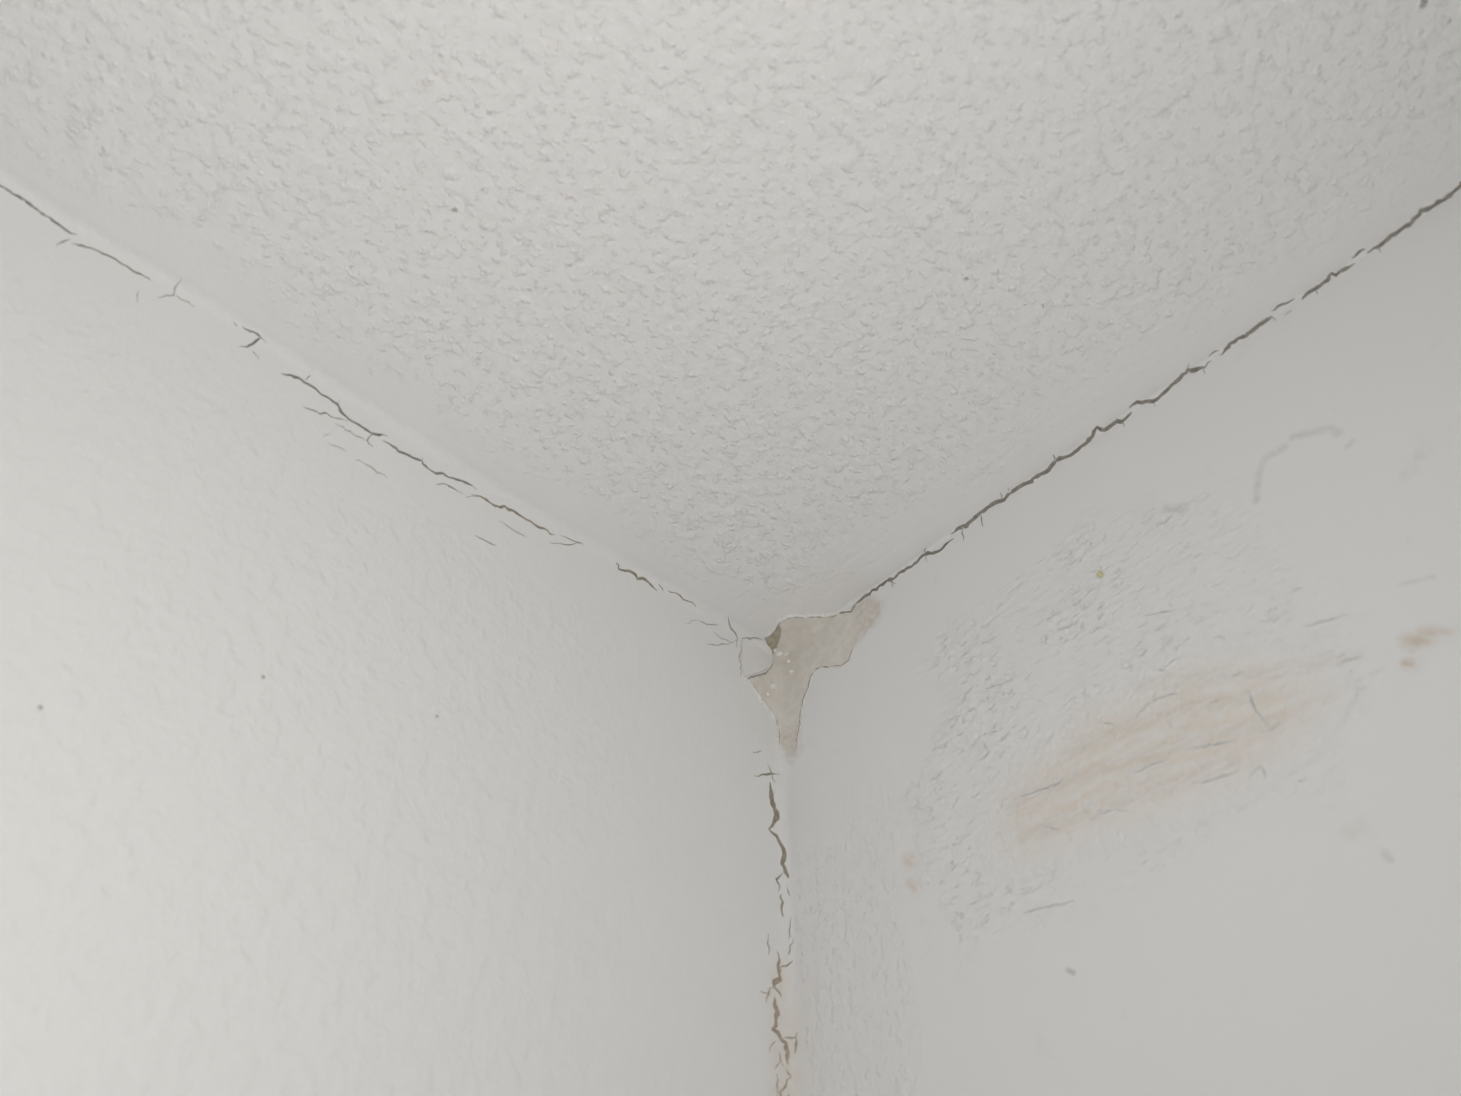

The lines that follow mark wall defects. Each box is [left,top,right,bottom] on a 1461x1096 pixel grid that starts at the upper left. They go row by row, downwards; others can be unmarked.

crack [0,185,195,307]
crack [233,321,584,546]
crack [850,179,1461,610]
crack [615,562,764,677]
spalling [741,598,881,755]
crack [753,750,811,1096]